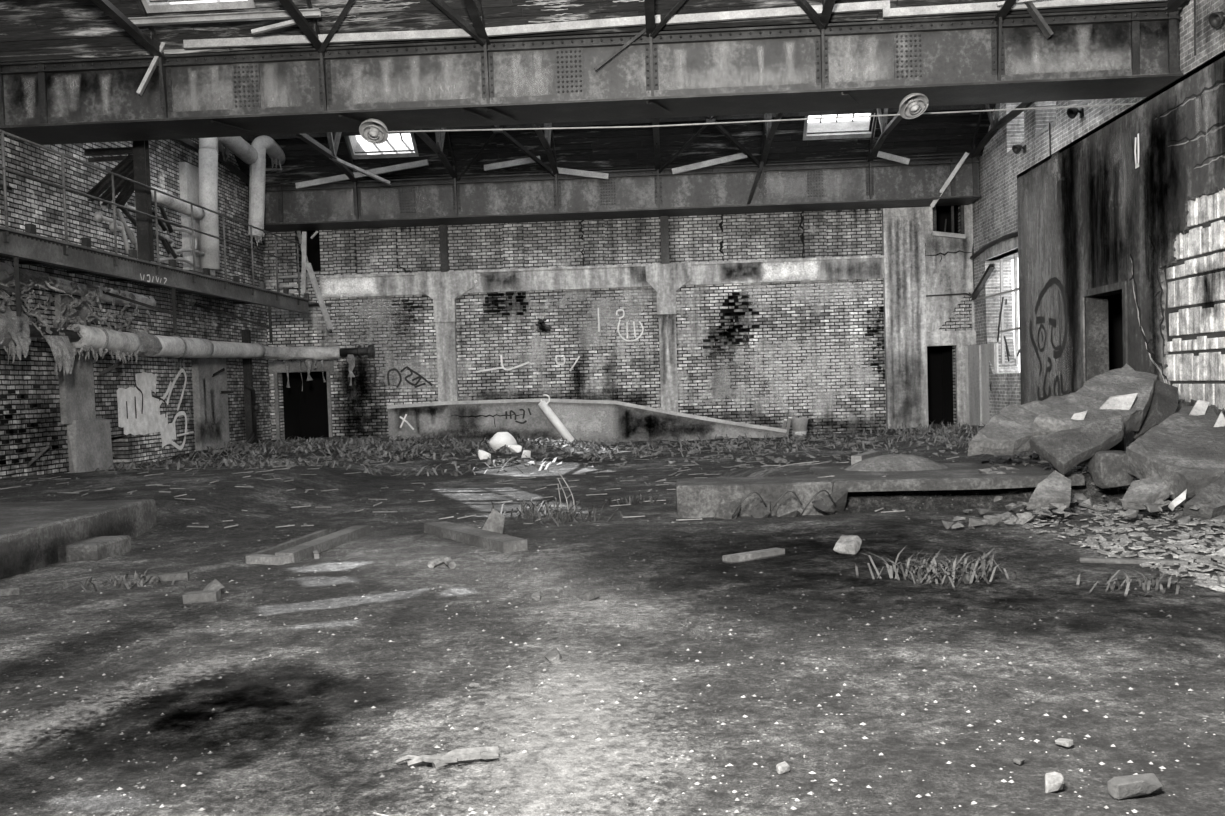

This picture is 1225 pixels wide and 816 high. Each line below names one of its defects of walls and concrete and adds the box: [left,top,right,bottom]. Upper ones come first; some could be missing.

spalling [483,292,552,333]
spalling [703,292,760,361]
flaking render [1155,187,1225,413]
spalling [0,385,57,466]